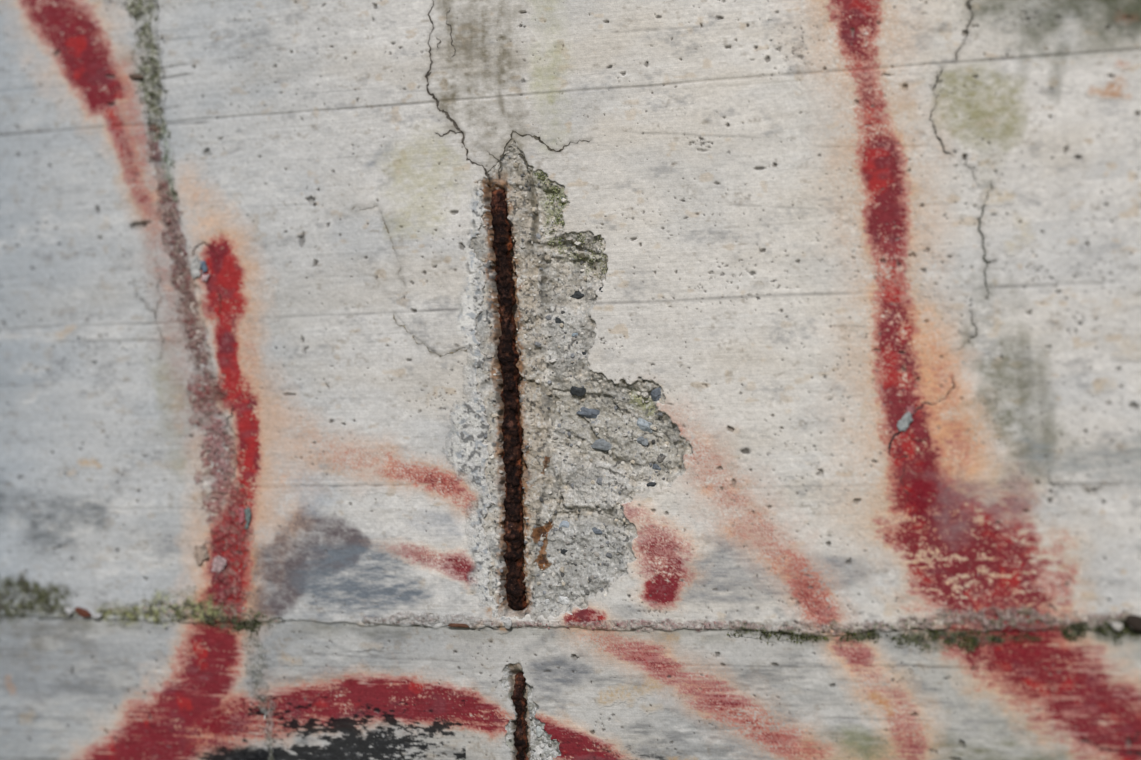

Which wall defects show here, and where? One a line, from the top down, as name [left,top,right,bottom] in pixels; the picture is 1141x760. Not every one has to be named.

crack [425,1,590,180]
crack [929,0,993,350]
spalling [361,141,1138,636]
crack [888,377,955,501]
spalling [500,663,561,760]